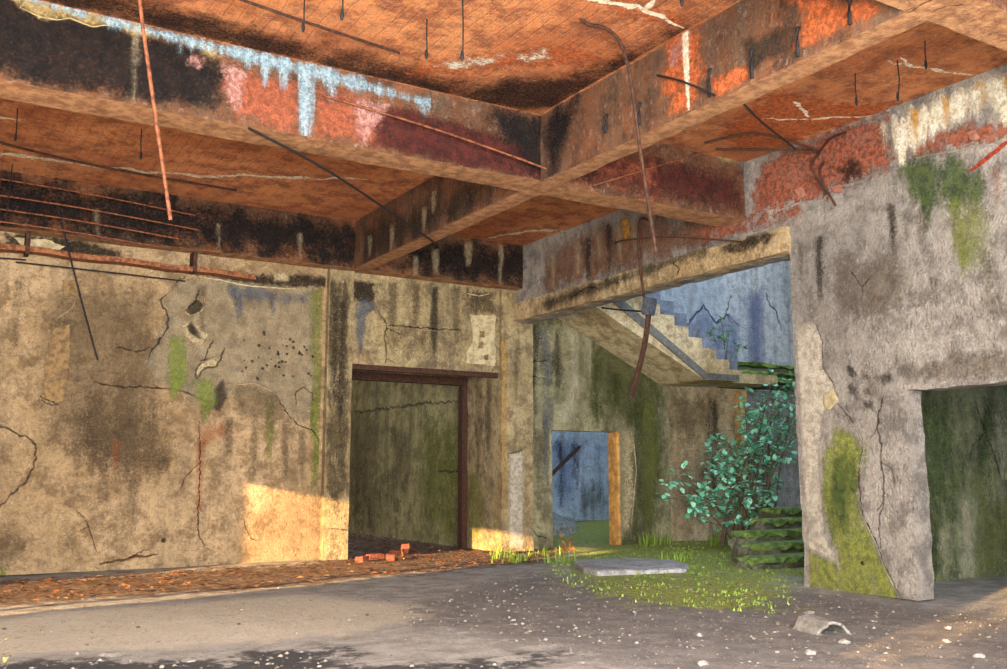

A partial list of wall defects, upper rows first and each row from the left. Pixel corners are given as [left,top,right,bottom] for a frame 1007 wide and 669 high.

damp [34,0,86,17]
crack [587,0,684,28]
damp [102,16,541,180]
damp [0,153,98,168]
spalling [913,121,1007,158]
damp [364,186,492,258]
damp [921,194,932,228]
flaking render [182,290,225,378]
spalling [147,273,326,364]
flaking render [213,331,320,444]
crack [0,426,39,507]